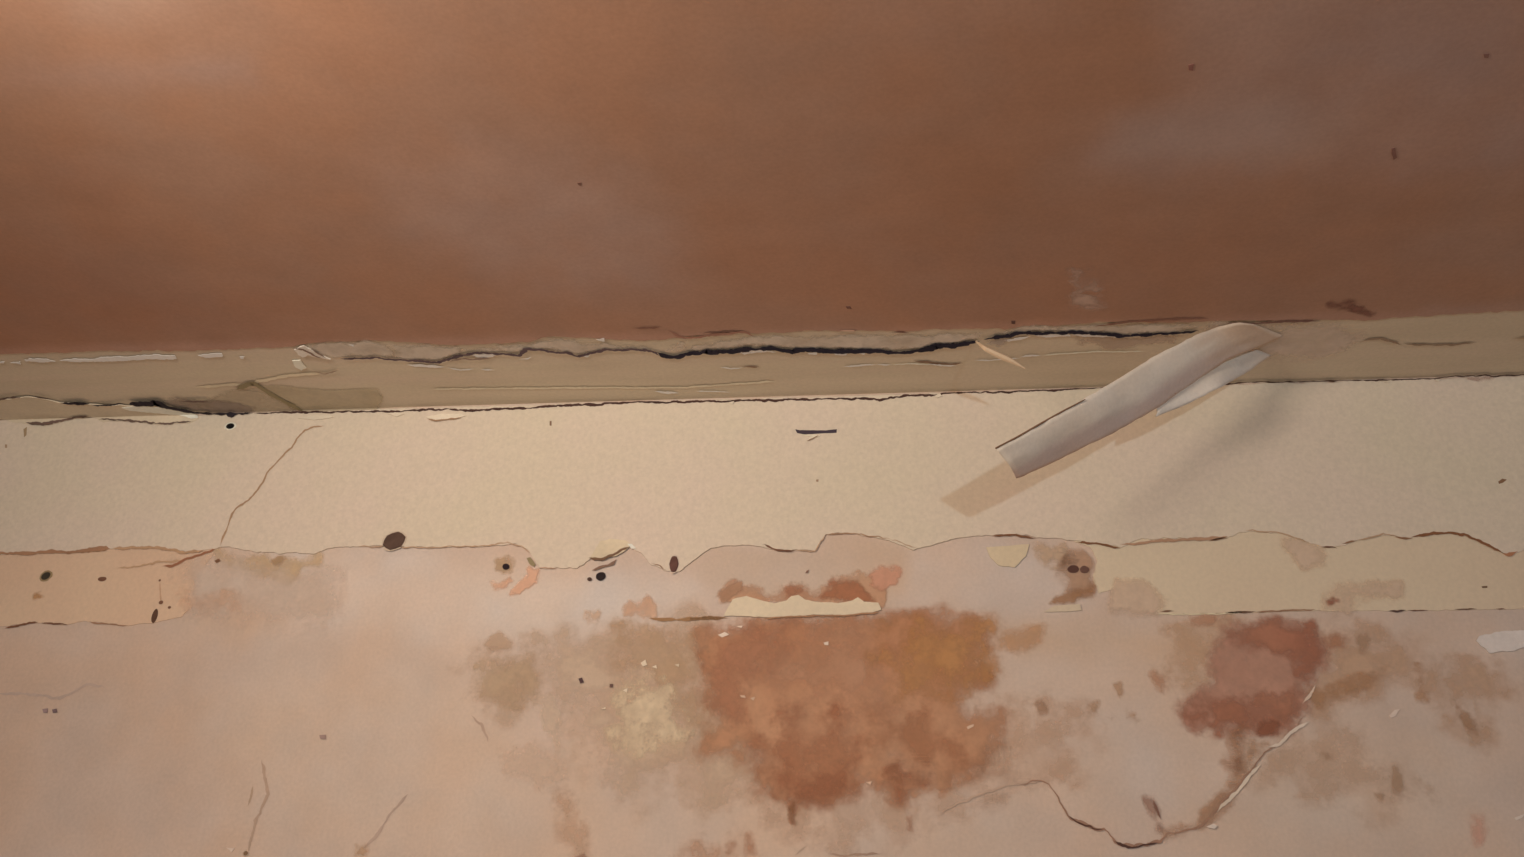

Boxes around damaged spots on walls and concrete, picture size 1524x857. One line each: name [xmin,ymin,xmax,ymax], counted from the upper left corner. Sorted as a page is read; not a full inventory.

crack [0,317,1317,569]
peeling [0,323,1524,628]
crack [1226,337,1524,385]
rust [695,567,1041,831]
crack [939,686,1315,849]
rust [1174,613,1328,823]